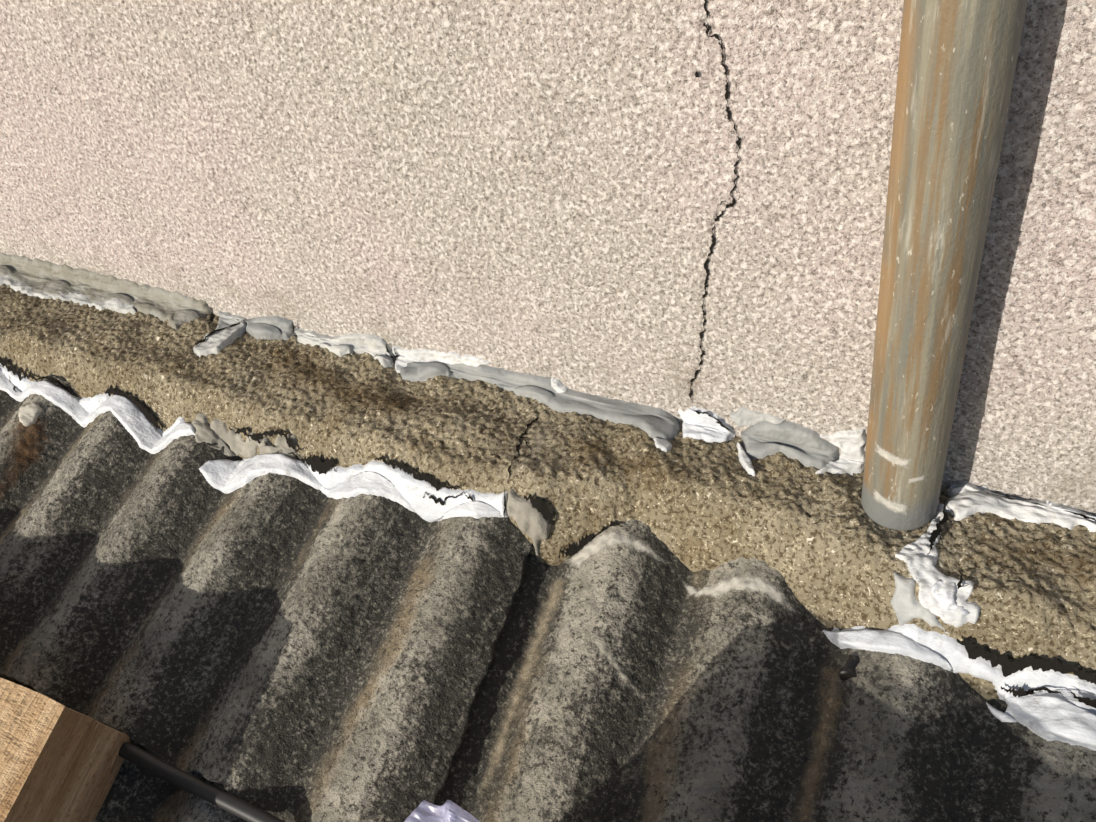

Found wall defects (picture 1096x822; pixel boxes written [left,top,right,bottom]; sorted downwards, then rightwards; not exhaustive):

crack [689,0,741,401]
corrosion [14,423,39,471]
crack [507,412,539,483]